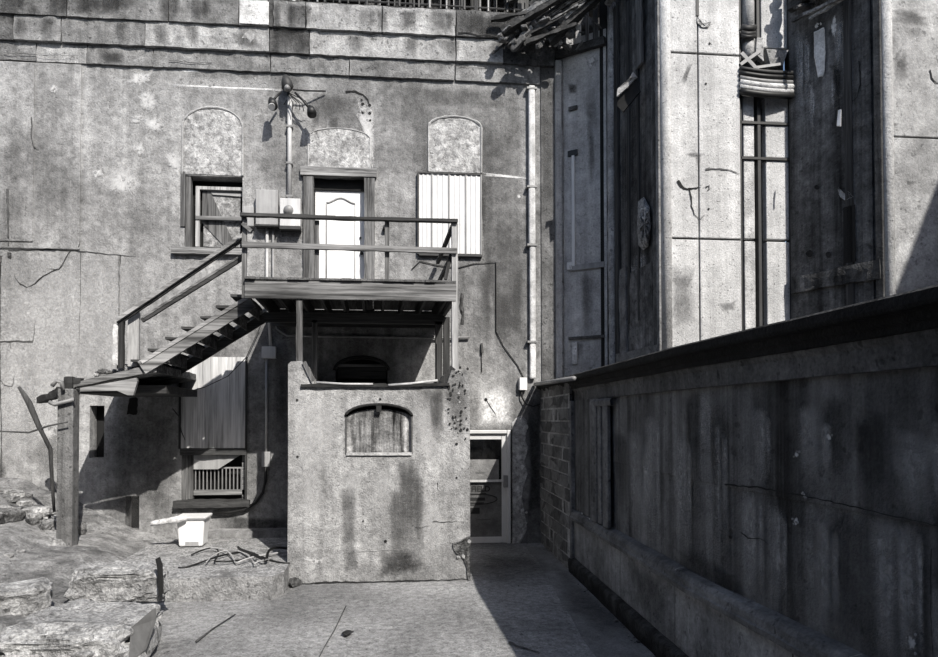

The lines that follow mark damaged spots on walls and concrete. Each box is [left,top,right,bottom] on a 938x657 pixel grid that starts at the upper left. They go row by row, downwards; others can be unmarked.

crack [0,189,136,477]
peeling [512,416,528,544]
water stain [385,553,418,572]